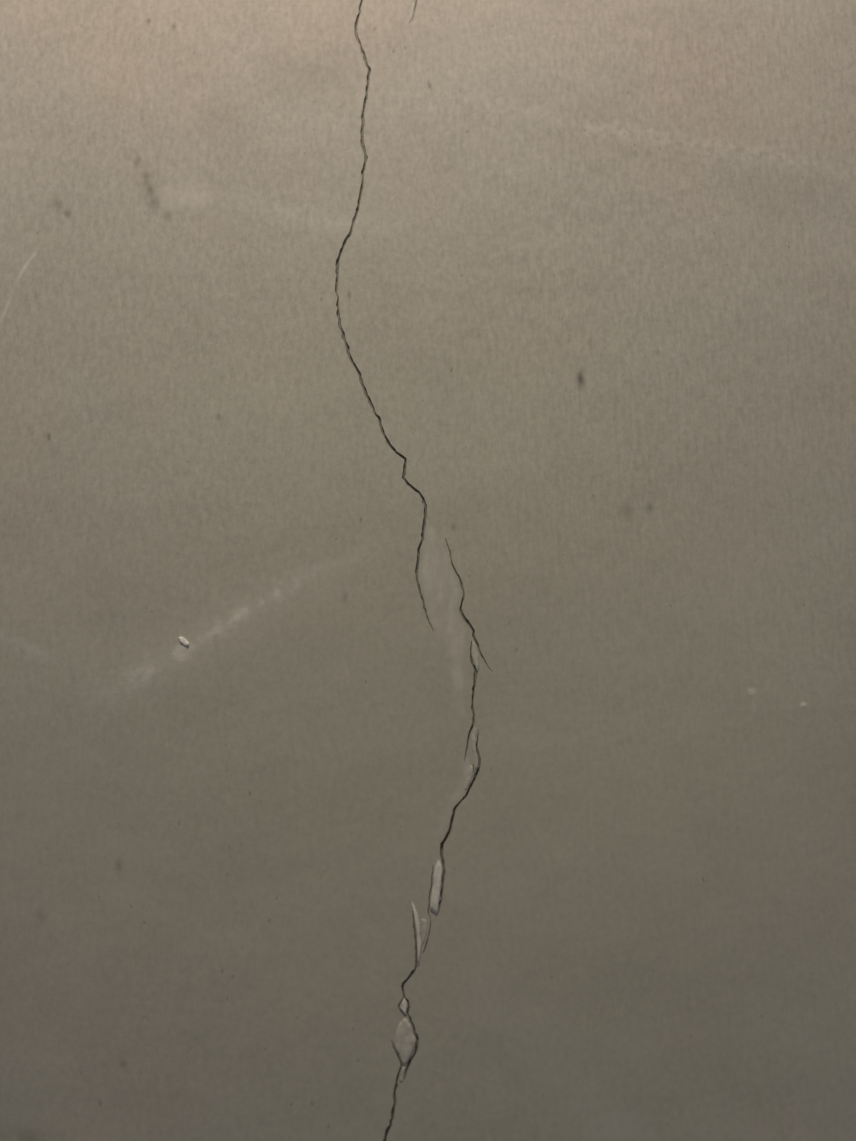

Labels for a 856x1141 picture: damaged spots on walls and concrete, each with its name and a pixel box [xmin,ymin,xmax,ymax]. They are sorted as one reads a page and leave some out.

crack [335,0,492,1141]